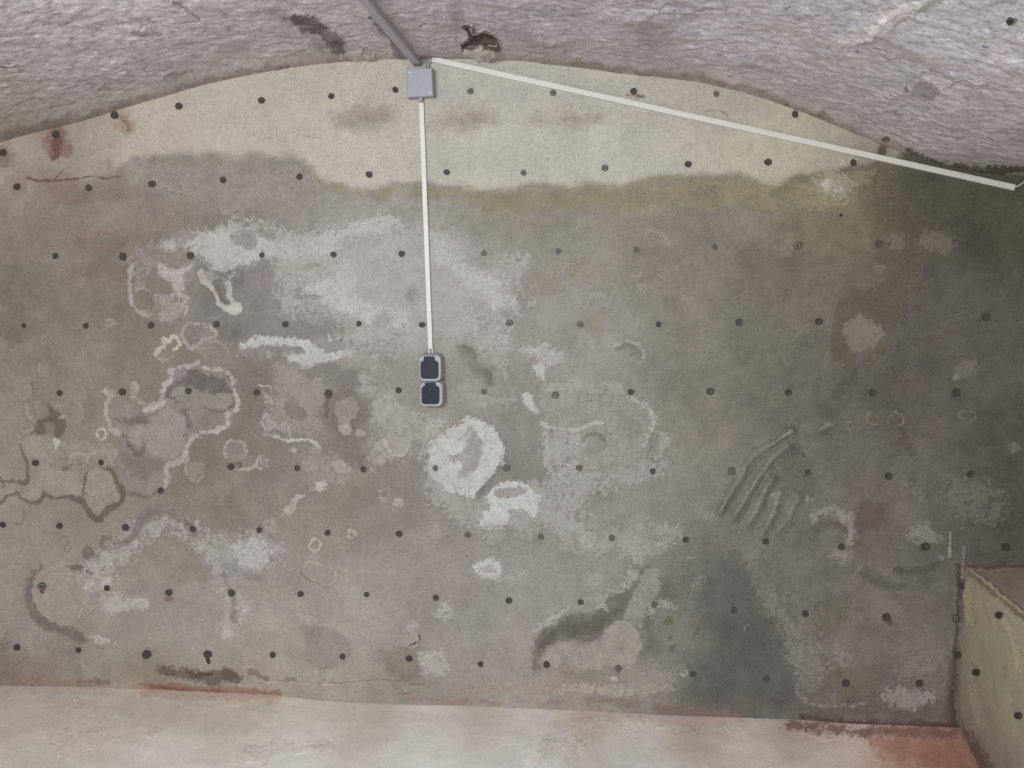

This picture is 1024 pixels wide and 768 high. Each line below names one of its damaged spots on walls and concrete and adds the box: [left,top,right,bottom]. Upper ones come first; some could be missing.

spalling [452,23,502,62]
water stain [0,150,999,768]
rust [135,677,290,713]